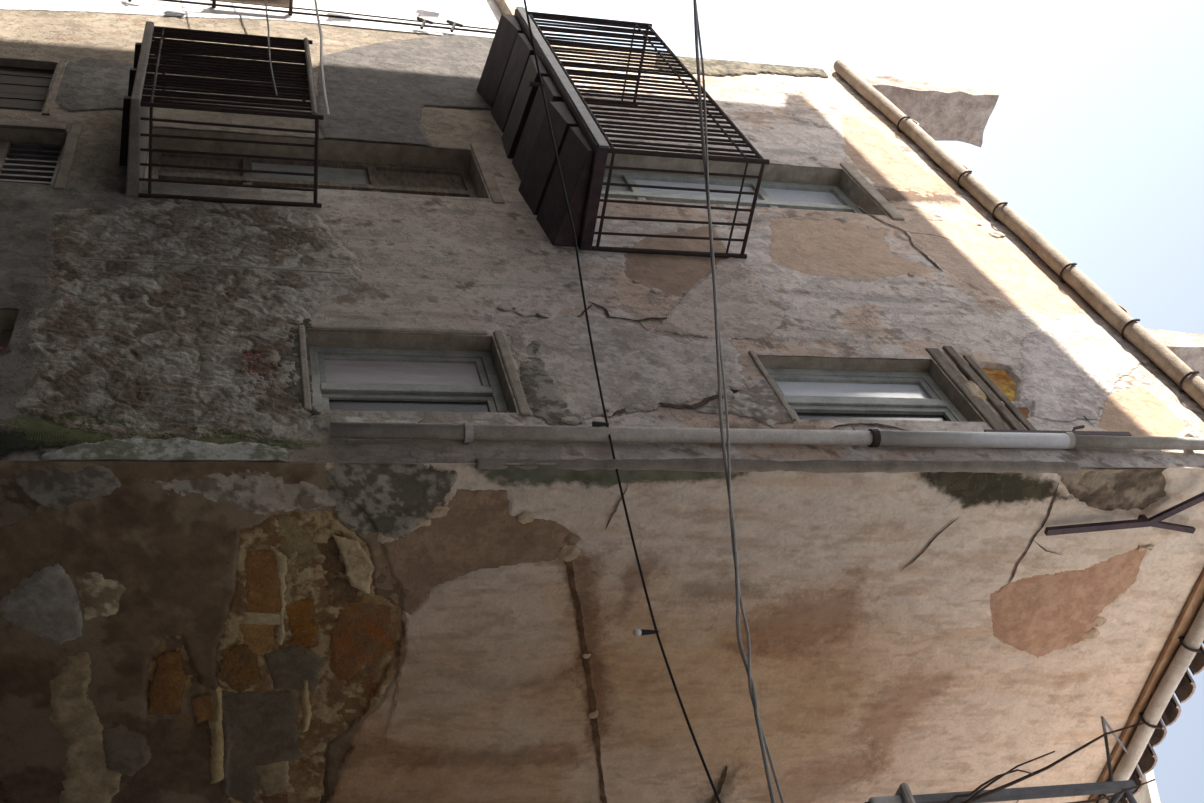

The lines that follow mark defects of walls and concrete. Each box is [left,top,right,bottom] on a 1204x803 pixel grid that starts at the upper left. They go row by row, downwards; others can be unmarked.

crack [850,200,953,271]
crack [496,301,667,331]
flaking render [507,226,790,426]
flaking render [768,218,1186,437]
leakage [41,436,294,461]
crack [609,382,747,417]
crack [605,486,628,530]
crack [1007,483,1061,585]
flaking render [0,461,581,803]
crack [565,556,608,803]
peeling [990,545,1155,658]
crack [712,766,727,803]